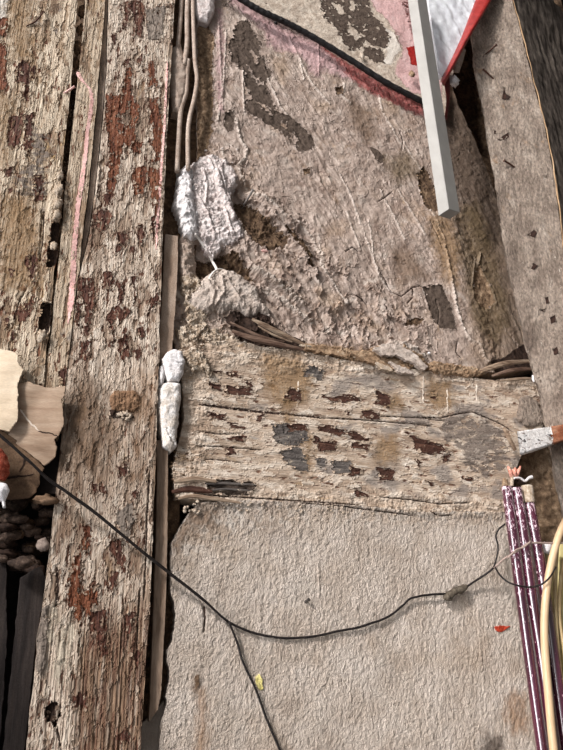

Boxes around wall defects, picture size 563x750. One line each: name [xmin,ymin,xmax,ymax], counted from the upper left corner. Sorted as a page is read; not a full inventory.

peeling [0,17,35,103]
leakage [264,20,347,77]
peeling [93,54,164,253]
spalling [5,222,59,343]
peeling [75,271,146,361]
flaking render [175,310,531,396]
flaking render [405,283,457,329]
crack [203,432,254,463]
peeling [271,423,371,476]
crack [198,404,513,432]
peeling [404,429,451,469]
peeling [65,491,139,656]